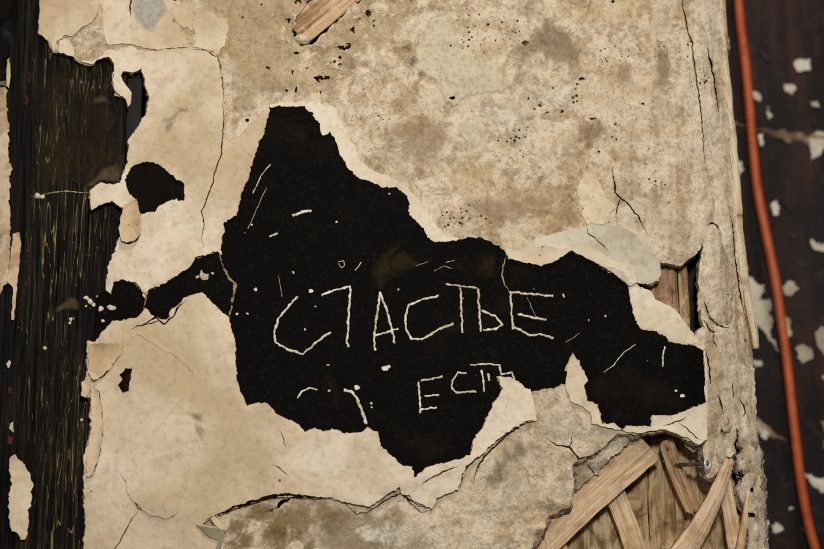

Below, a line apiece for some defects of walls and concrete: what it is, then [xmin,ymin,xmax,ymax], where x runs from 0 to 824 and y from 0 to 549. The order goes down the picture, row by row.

flaking render [203,0,414,106]
crack [682,0,824,157]
flaking render [794,59,810,72]
flaking render [38,0,270,295]
crack [194,49,237,317]
crack [612,168,647,232]
crack [132,290,186,329]
peeling [81,101,708,549]
flaking render [749,277,779,352]
flaking render [795,326,824,364]
crack [91,347,123,475]
crack [114,502,143,549]